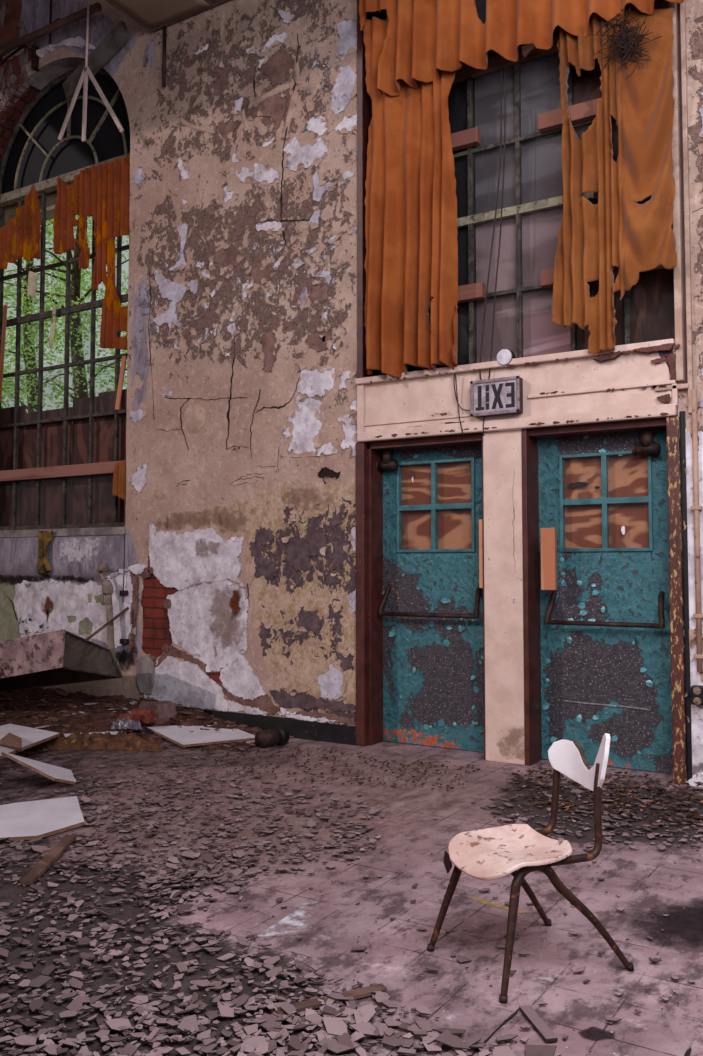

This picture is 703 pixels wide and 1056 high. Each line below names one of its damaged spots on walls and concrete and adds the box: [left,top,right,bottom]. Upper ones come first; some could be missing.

spalling [0,0,96,130]
peeling [177,157,190,180]
crack [148,269,329,483]
peeling [150,224,357,356]
peeling [259,332,278,373]
peeling [256,221,285,235]
peeling [211,7,357,231]
crack [261,126,310,246]
peeling [281,364,359,484]
peeling [0,502,356,750]
peeling [556,557,609,644]
peeling [683,429,703,787]